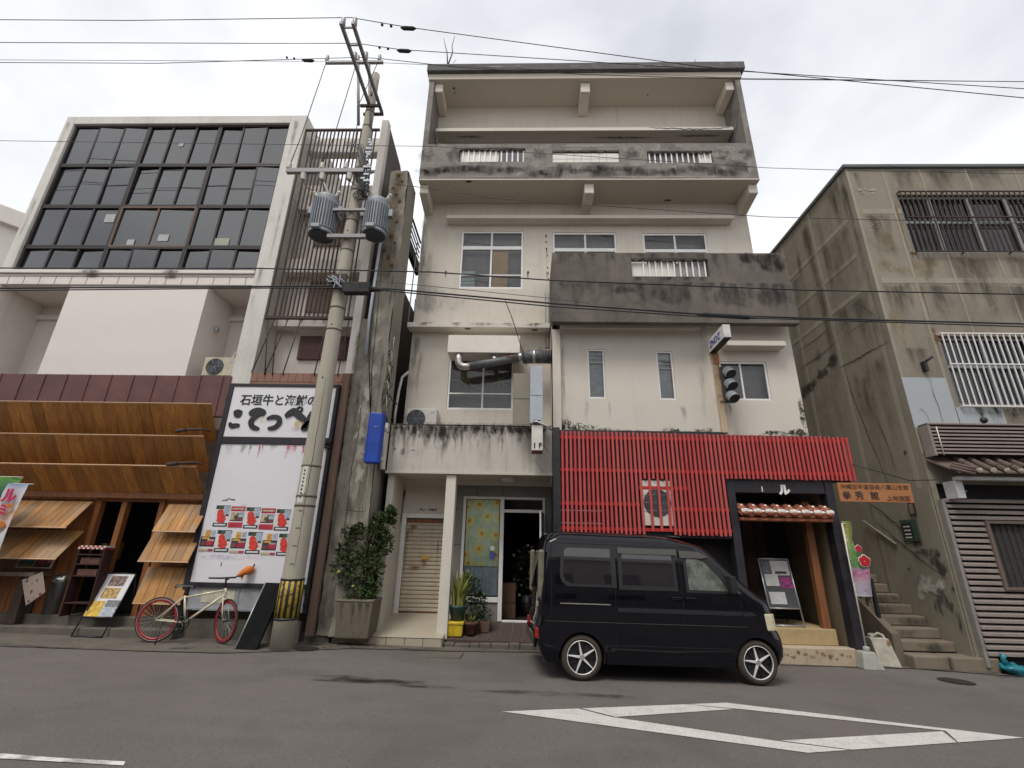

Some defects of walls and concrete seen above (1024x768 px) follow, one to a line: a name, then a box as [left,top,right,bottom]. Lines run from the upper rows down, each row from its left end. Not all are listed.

water stain [390,423,546,441]